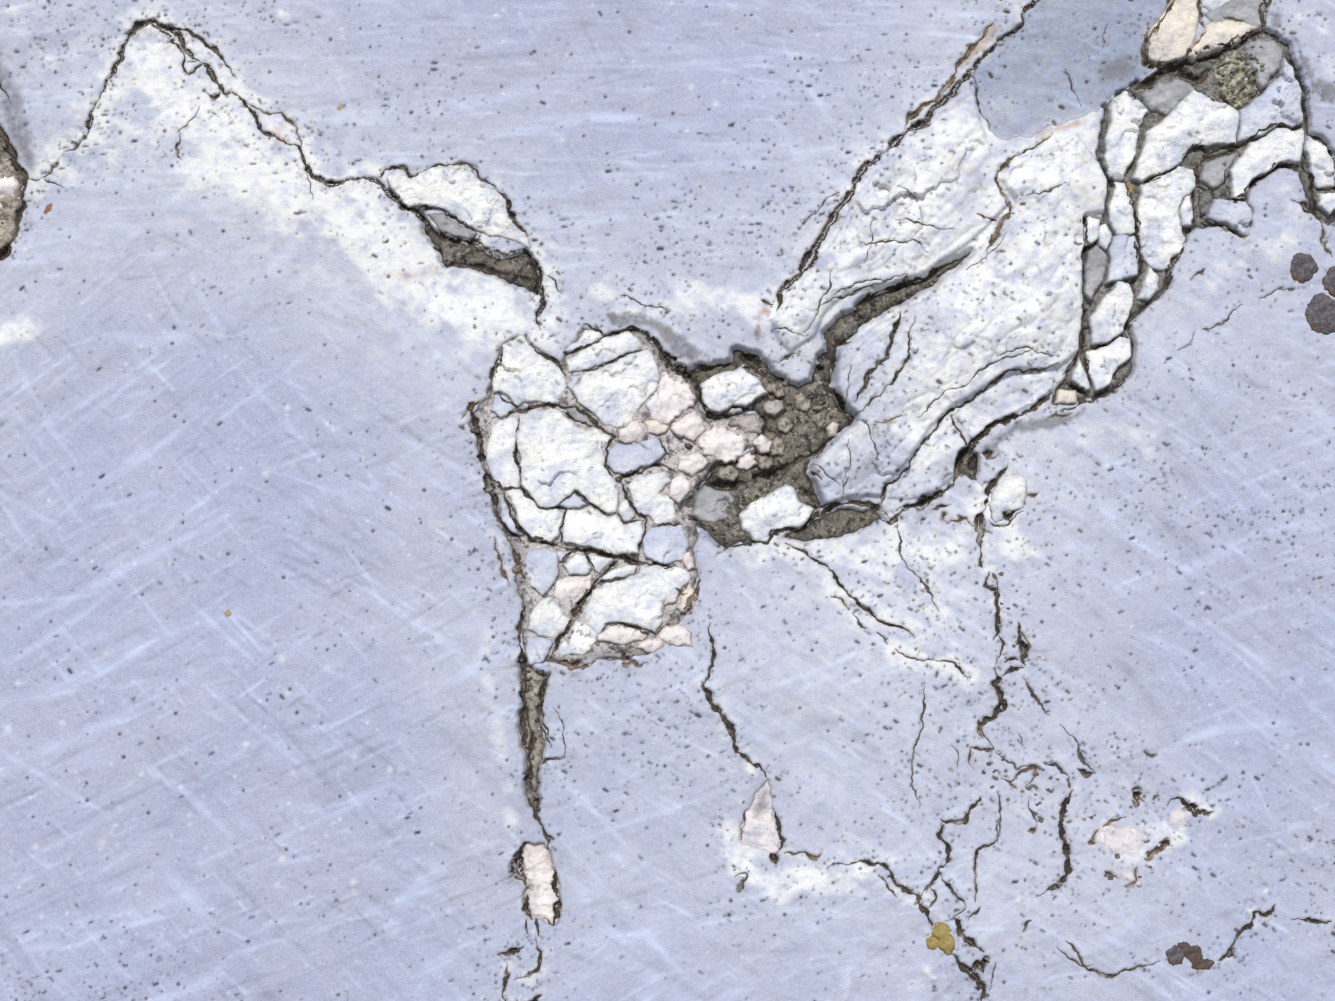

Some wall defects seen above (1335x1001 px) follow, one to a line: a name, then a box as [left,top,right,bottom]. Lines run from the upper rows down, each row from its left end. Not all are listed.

spalling [0,127,29,261]
crack [28,19,566,375]
spalling [974,0,1335,405]
crack [586,295,732,414]
spalling [468,253,978,670]
peeling [989,473,1037,527]
crack [494,536,566,850]
crack [702,465,1095,1001]
crack [498,918,542,1001]
spalling [510,841,562,926]
crack [1057,942,1160,978]
crack [1218,904,1332,961]